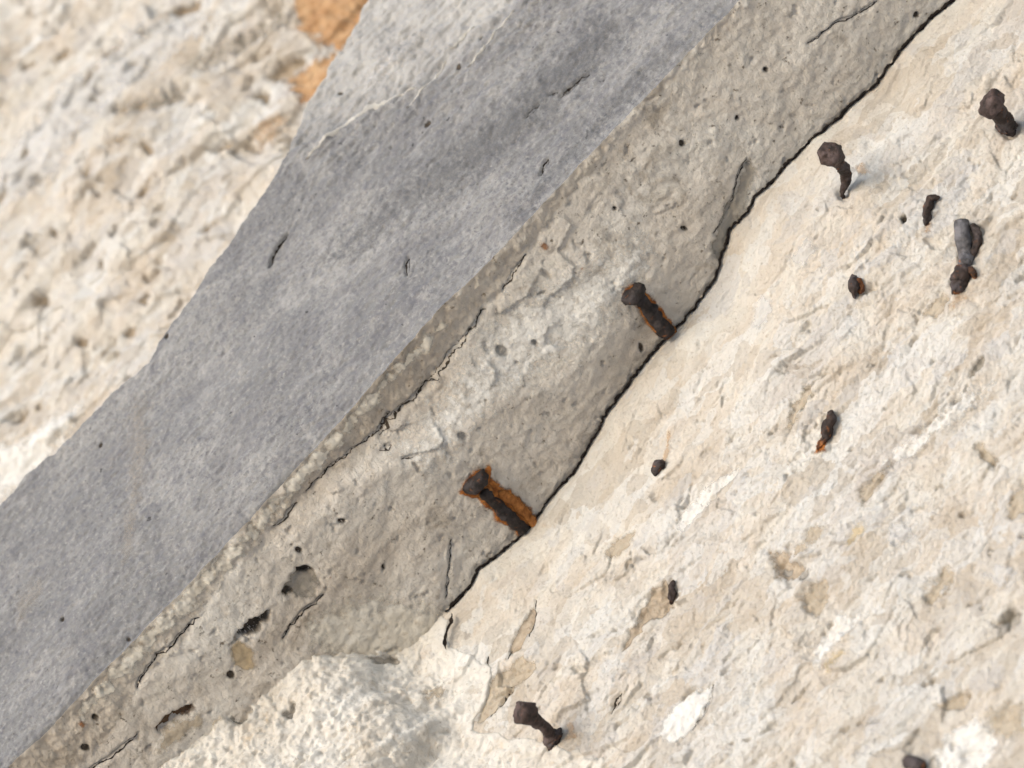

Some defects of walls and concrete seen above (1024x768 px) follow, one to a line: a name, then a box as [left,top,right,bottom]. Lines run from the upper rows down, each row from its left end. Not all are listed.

rust [968,223,983,279]
crack [443,0,955,649]
crack [273,309,484,526]
rust [815,437,827,453]
rust [459,466,537,536]
spalling [282,565,320,598]
spalling [237,610,268,634]
crack [282,594,324,638]
crack [137,617,199,688]
rust [548,723,576,748]